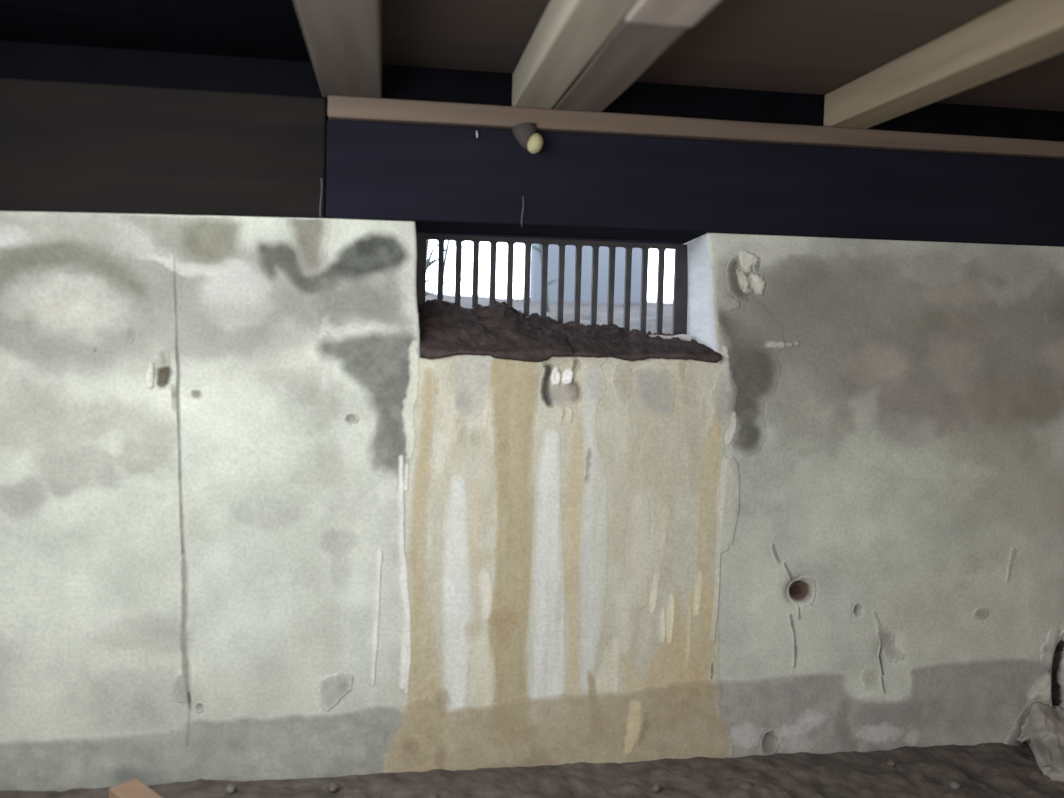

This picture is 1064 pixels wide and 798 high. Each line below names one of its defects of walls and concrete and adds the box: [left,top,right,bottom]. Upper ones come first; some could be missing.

spalling [144,348,203,400]
crack [169,247,192,746]
damp [0,215,420,792]
damp [430,405,497,707]
rust [383,355,733,773]
spalling [537,357,607,425]
damp [525,251,800,697]
crack [771,542,800,668]
crack [872,610,904,693]
peeling [1027,628,1064,702]